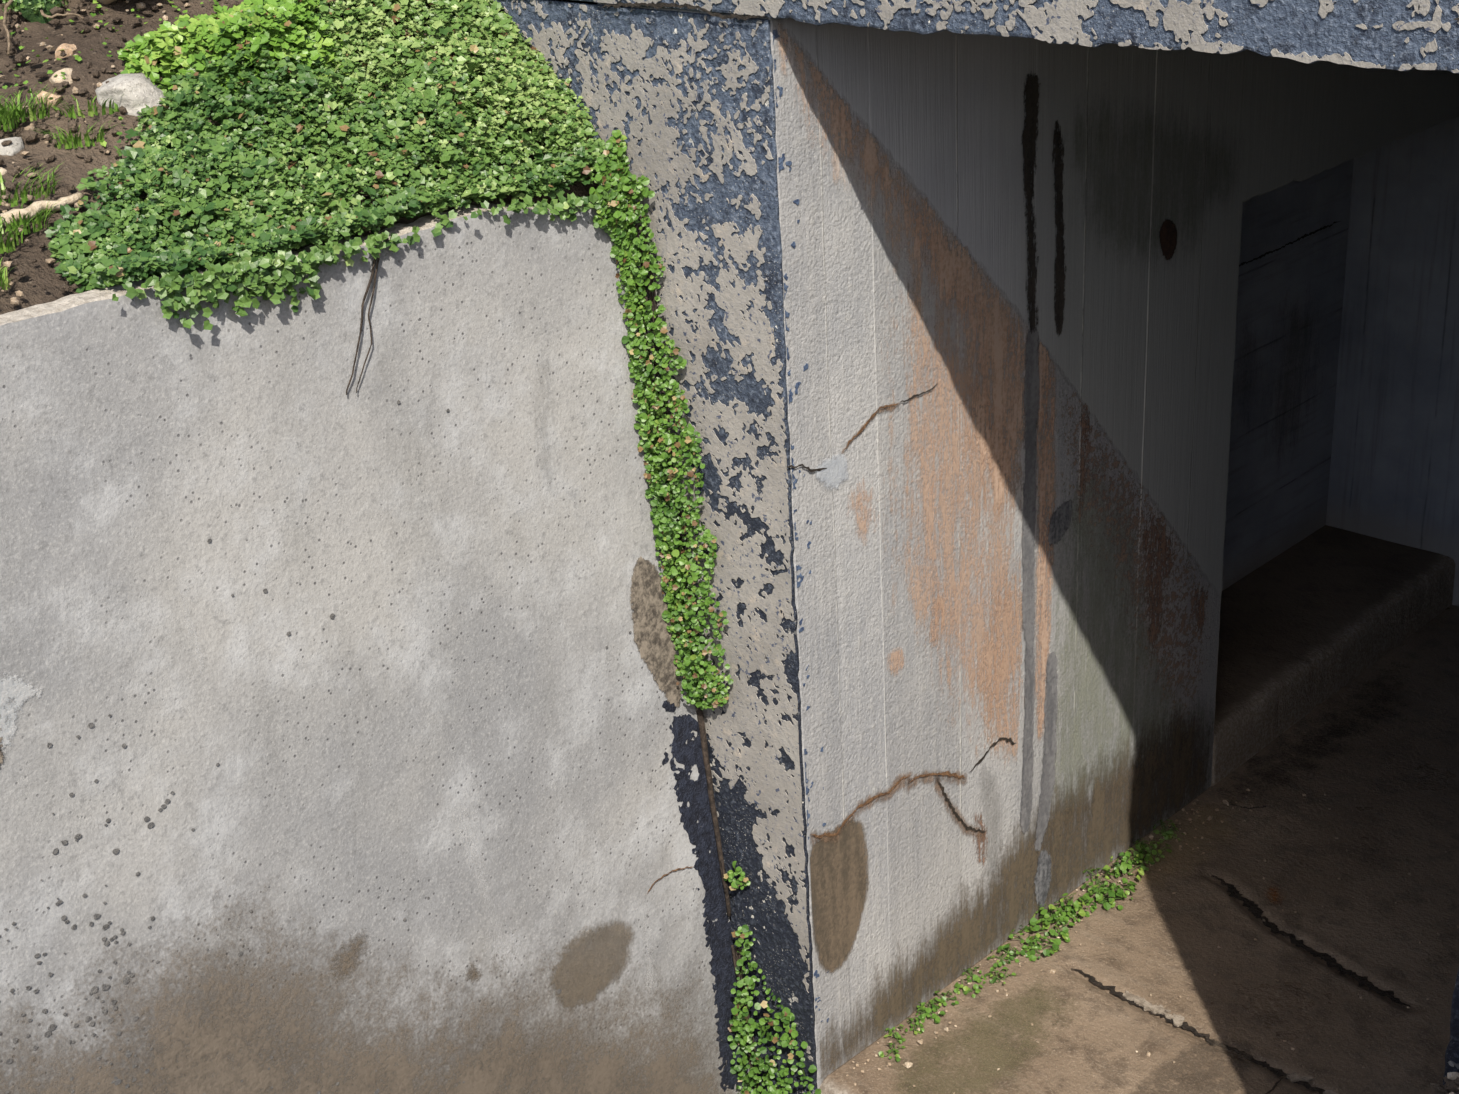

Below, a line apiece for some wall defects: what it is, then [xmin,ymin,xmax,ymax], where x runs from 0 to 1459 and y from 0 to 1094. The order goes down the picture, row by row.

peeling [1270,0,1459,73]
damp [1022,74,1066,335]
rust [1160,219,1177,260]
crack [787,384,937,472]
rust [779,29,1057,756]
peeling [504,0,1244,1092]
crack [812,737,1015,843]
damp [0,922,731,1094]
damp [810,820,869,972]
damp [820,665,1407,1072]
crack [1071,968,1338,1094]
crack [1212,875,1411,1007]